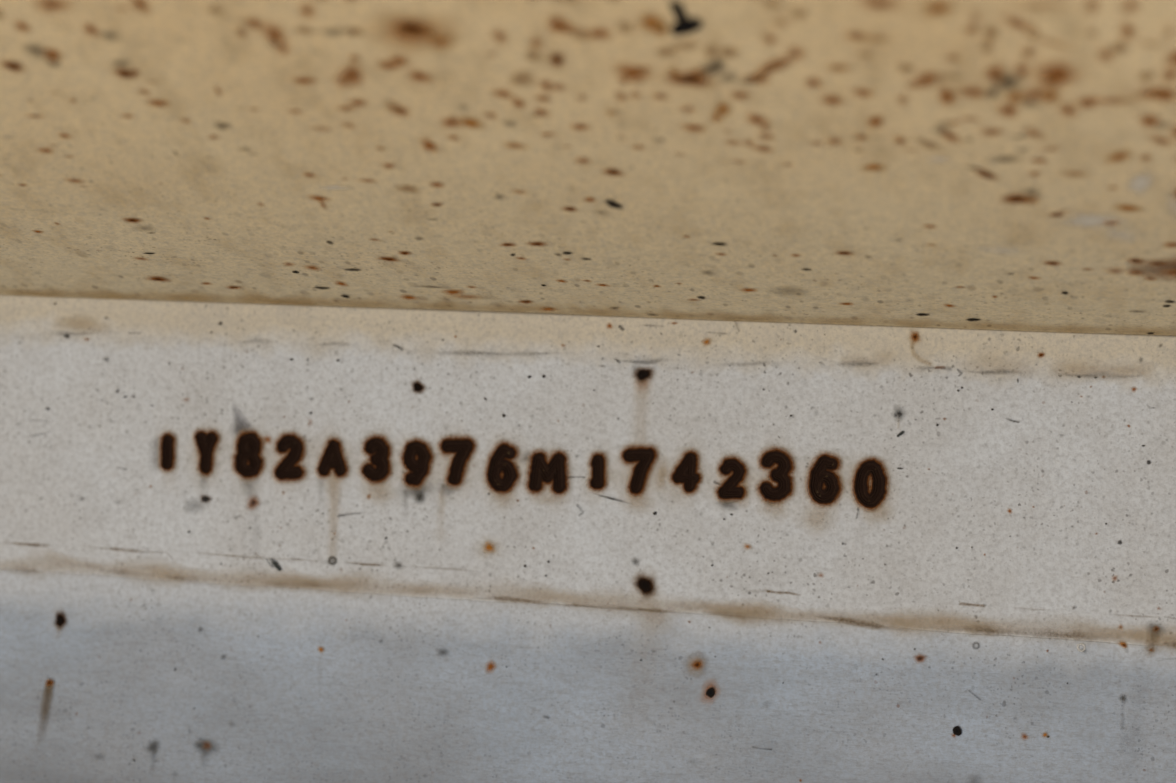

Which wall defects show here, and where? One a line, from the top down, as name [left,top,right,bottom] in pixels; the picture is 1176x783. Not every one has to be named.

rust [398,23,445,45]
rust [551,19,607,37]
rust [643,17,665,35]
rust [622,68,644,78]
rust [672,71,704,86]
rust [1142,54,1176,99]
rust [1002,67,1094,114]
rust [446,119,479,139]
rust [1006,195,1034,203]
rust [635,576,654,596]
rust [55,613,66,628]
rust [43,680,53,714]